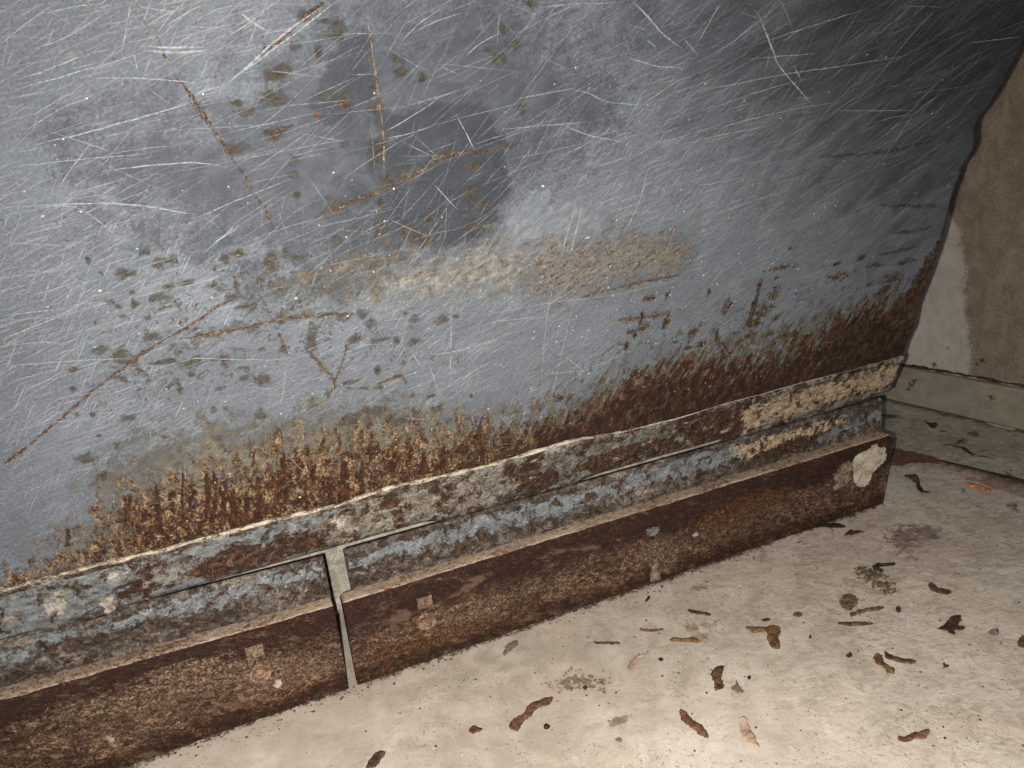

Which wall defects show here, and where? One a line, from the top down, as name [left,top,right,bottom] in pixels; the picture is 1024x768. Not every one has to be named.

corrosion [231,100,254,116]
peeling [0,364,899,670]
corrosion [0,218,942,678]
corrosion [4,643,330,740]